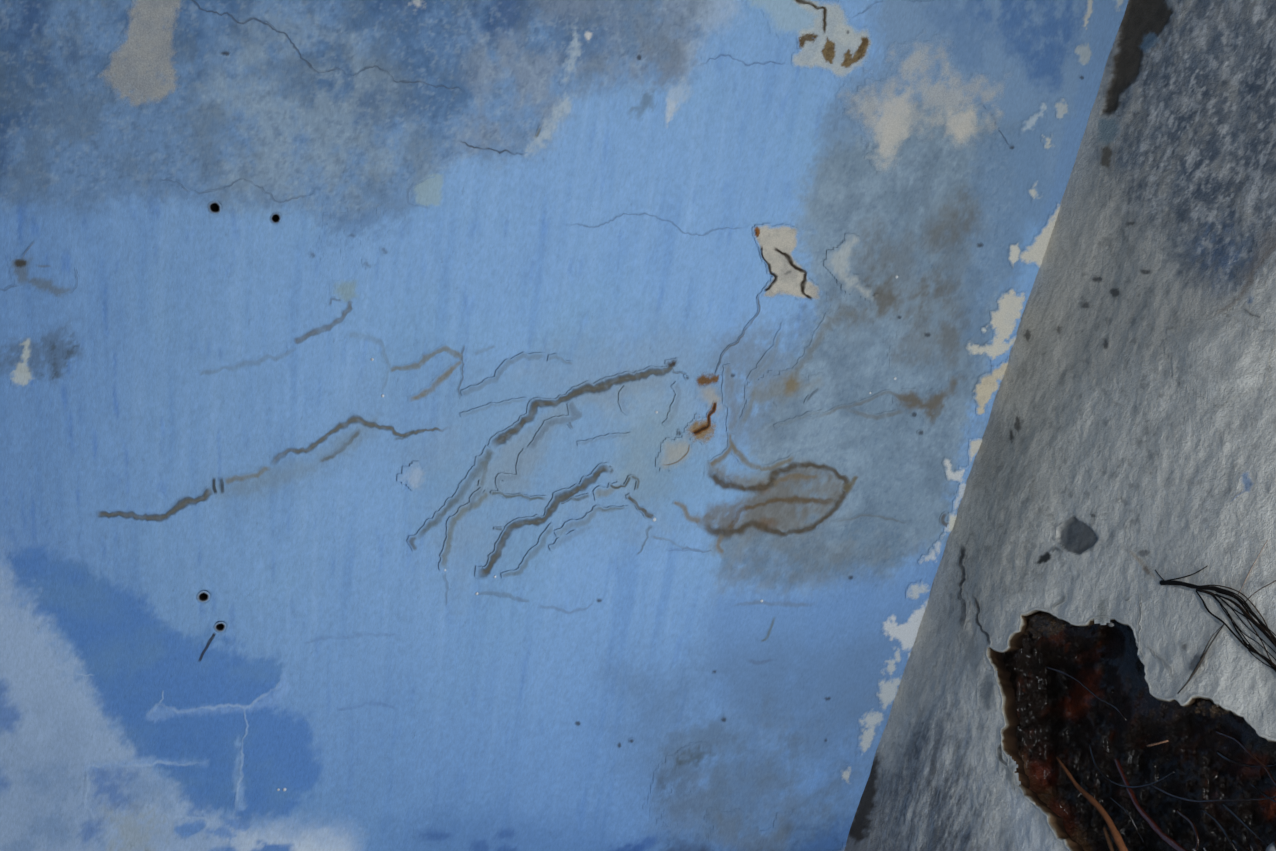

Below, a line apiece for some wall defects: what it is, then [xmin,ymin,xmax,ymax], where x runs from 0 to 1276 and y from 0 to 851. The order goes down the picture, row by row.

flaking render [96,0,183,114]
flaking render [742,0,1014,175]
flaking render [752,223,821,302]
peeling [824,234,879,303]
peeling [1008,180,1061,269]
peeling [965,288,1032,417]
rust [656,370,725,472]
flaking render [1007,415,1024,445]
water stain [0,177,998,851]
spalling [985,608,1276,851]